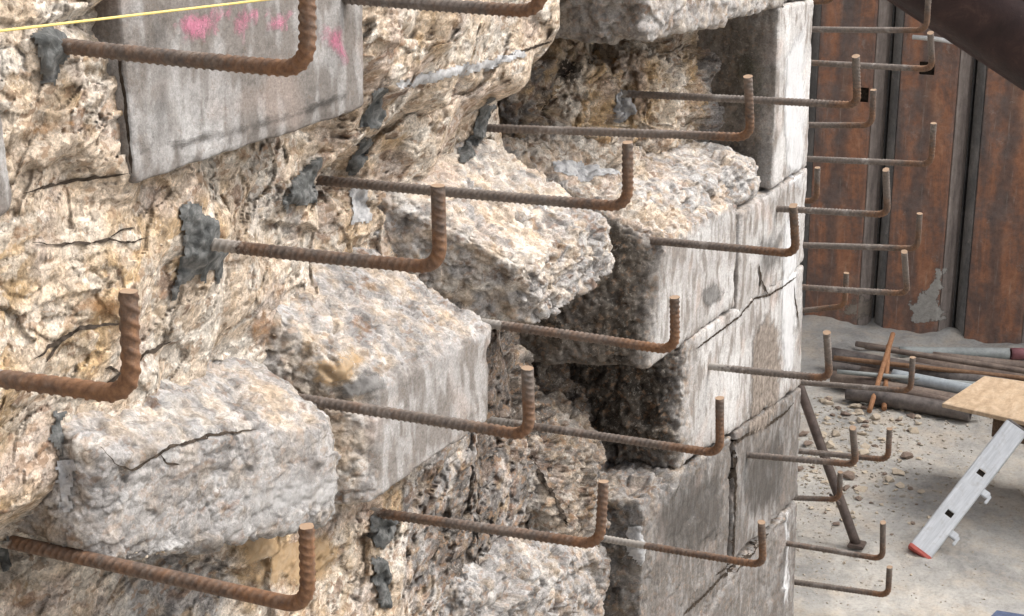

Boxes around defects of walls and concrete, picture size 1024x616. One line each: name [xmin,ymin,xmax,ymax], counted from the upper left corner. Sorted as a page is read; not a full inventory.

spalling [61,0,317,77]
crack [23,61,132,194]
spalling [210,0,935,273]
crack [32,227,145,246]
spalling [646,122,937,313]
spalling [0,288,142,403]
crack [696,266,799,349]
crack [101,429,257,471]
spalling [298,365,724,456]
crack [684,403,794,615]
rust [235,537,300,586]
rust [314,537,339,579]